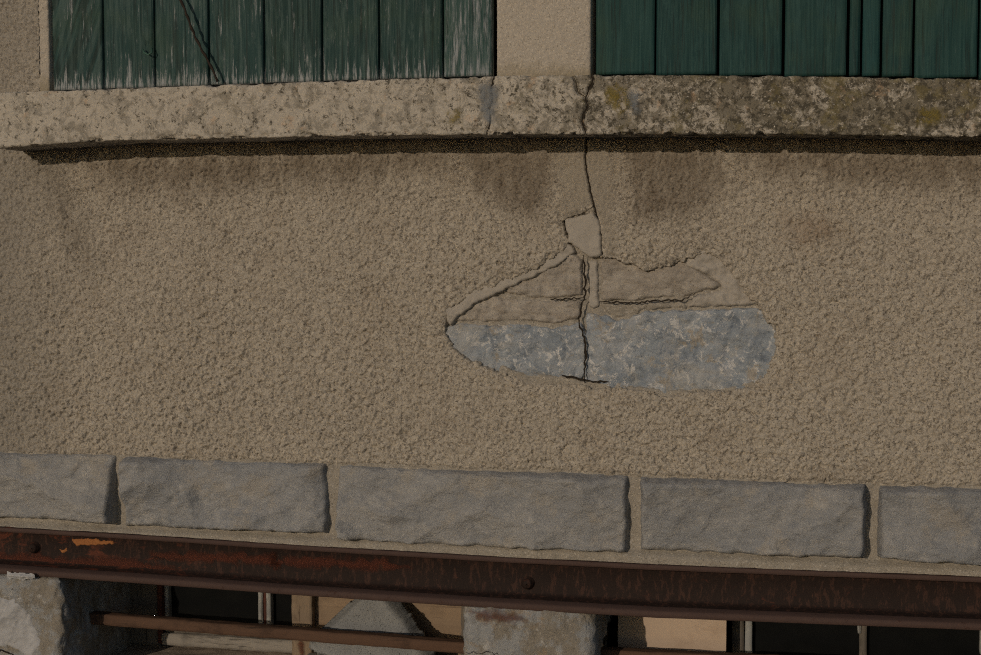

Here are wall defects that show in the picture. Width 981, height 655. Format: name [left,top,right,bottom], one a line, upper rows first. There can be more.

crack [564,74,598,222]
spalling [446,226,776,397]
peeling [0,597,40,655]
peeling [7,571,35,580]